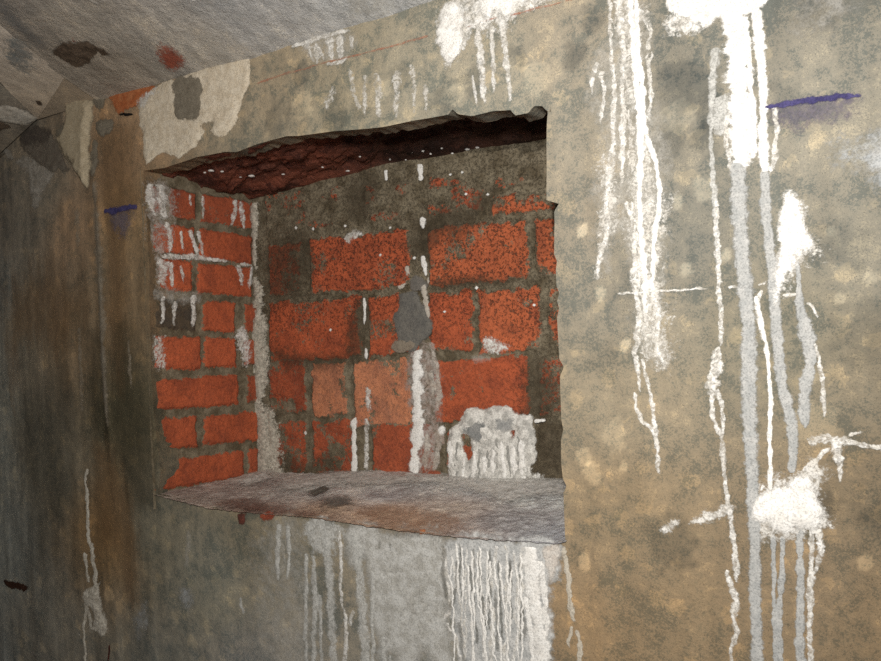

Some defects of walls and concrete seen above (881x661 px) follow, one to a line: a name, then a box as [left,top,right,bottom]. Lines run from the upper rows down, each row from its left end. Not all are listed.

leakage [373,0,560,107]
leakage [154,336,166,368]
leakage [145,183,227,324]
leakage [231,200,583,661]
leakage [589,0,881,661]
leakage [82,469,108,661]